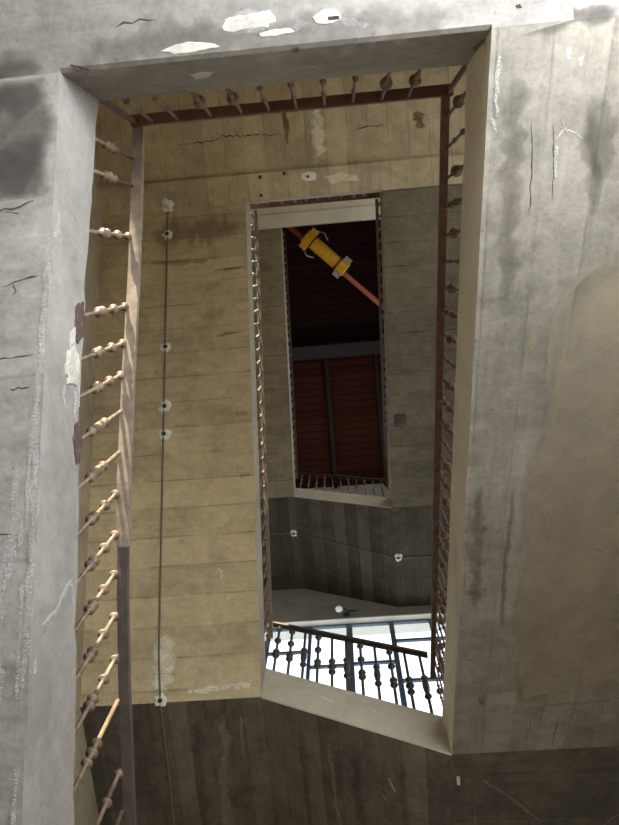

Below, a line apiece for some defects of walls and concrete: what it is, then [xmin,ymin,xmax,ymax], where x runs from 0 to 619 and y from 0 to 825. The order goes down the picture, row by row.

crack [118,18,152,26]
peeling [218,6,369,38]
peeling [160,42,220,54]
damp [0,85,49,195]
crack [179,132,281,145]
peeling [301,171,359,184]
crack [0,200,34,214]